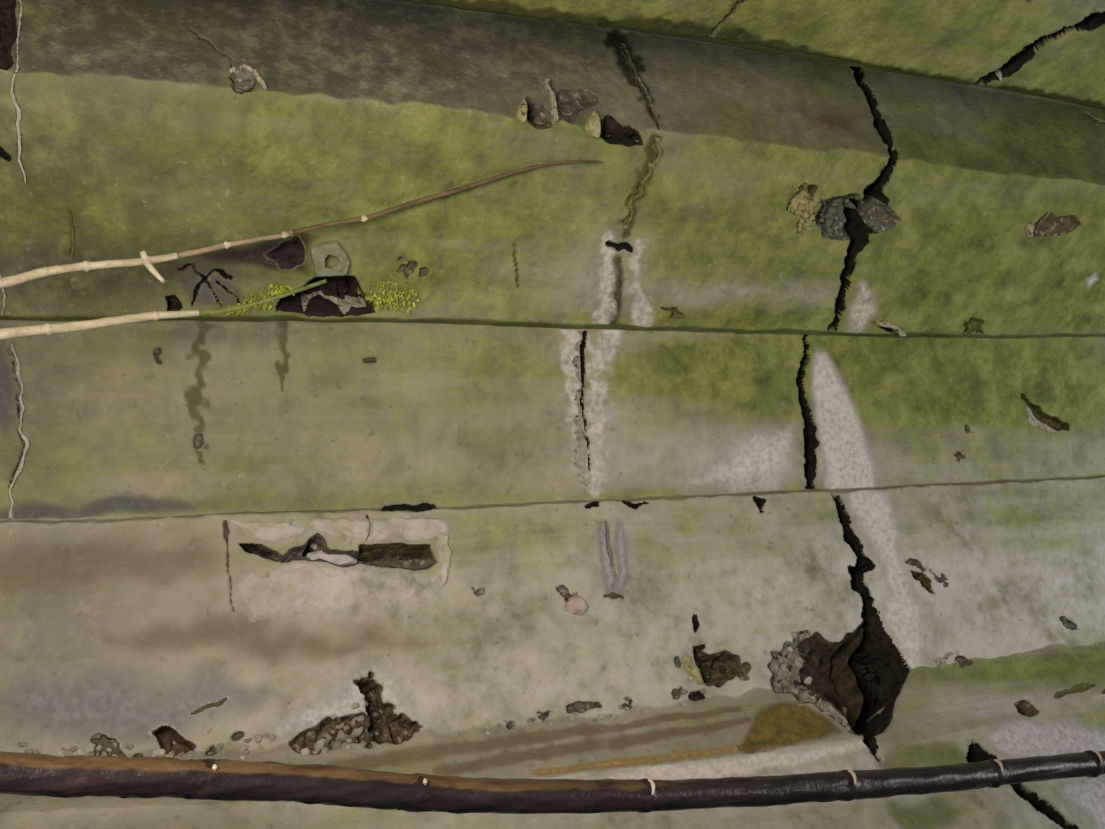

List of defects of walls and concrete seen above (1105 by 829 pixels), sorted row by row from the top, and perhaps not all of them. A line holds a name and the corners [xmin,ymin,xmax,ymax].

crack [975,11,1105,86]
crack [0,0,26,184]
spalling [517,78,643,147]
crack [560,29,662,509]
crack [796,66,898,629]
water stain [850,282,874,333]
water stain [811,351,927,669]
spalling [55,725,277,760]
spalling [289,671,424,755]
spalling [672,644,752,707]
spalling [768,611,910,741]
crack [1010,783,1078,829]